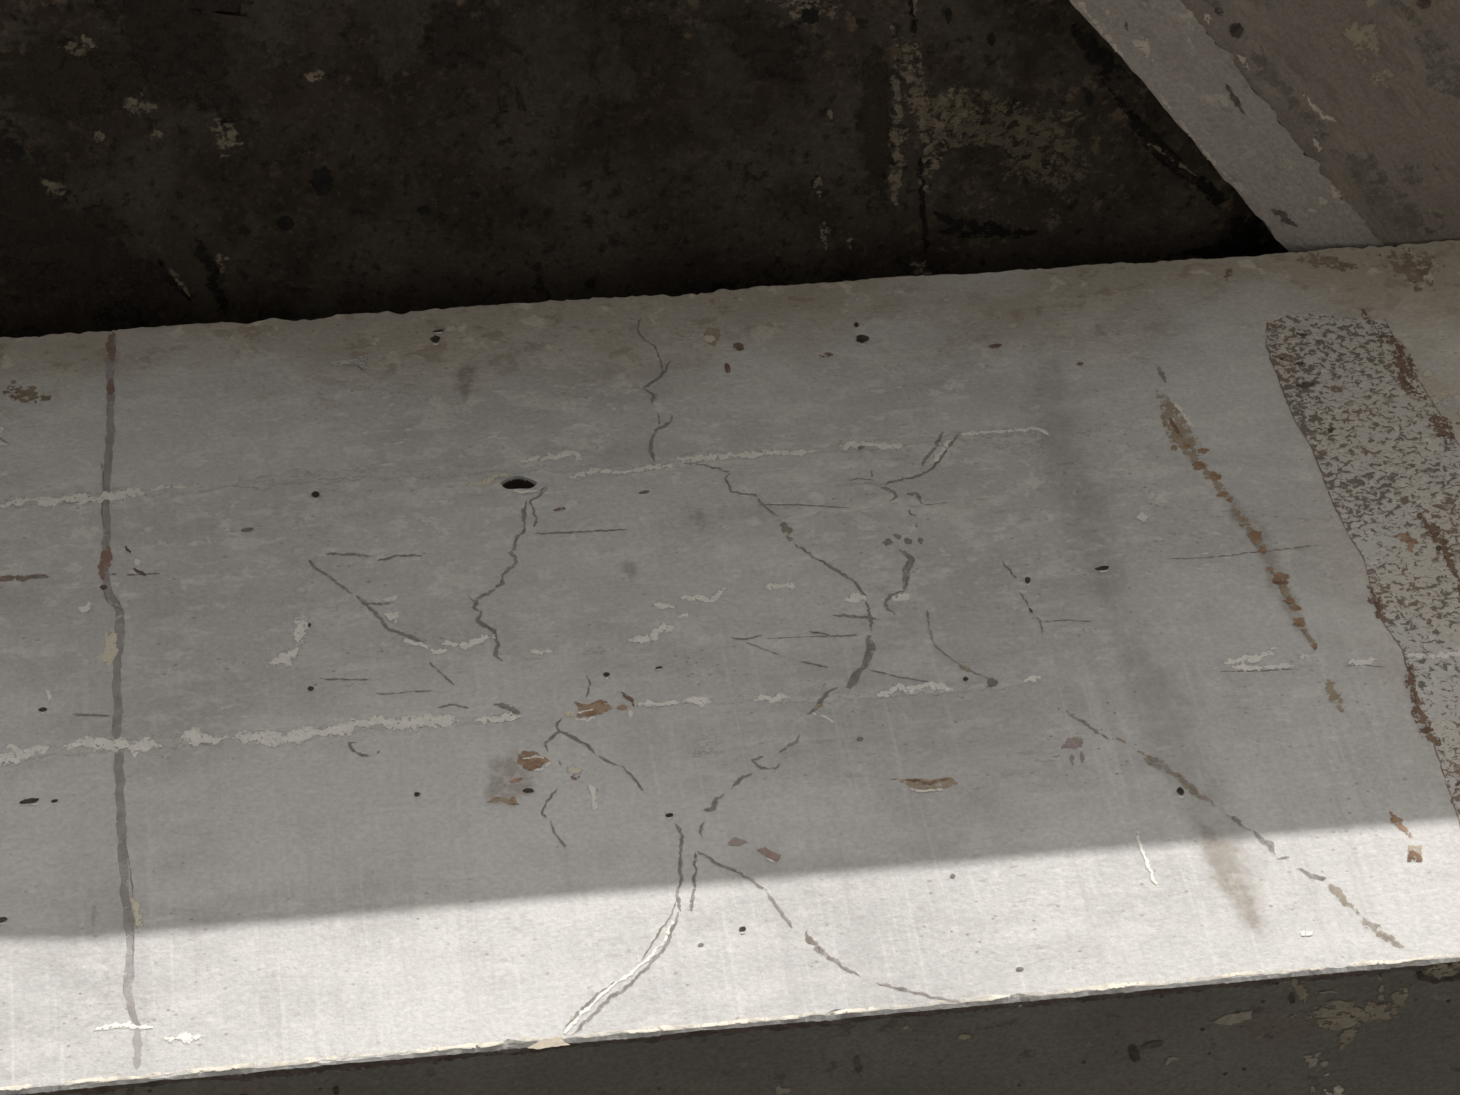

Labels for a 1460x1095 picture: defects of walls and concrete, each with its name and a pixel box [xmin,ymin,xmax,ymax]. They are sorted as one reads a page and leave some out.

rust [1361,309,1454,448]
crack [637,318,980,723]
rust [1157,373,1317,650]
rust [1389,508,1460,603]
crack [98,333,160,1095]
spalling [489,751,599,810]
crack [541,677,643,847]
spalling [564,692,634,722]
crack [528,747,962,1049]
crack [1078,719,1403,948]
rust [1389,811,1423,862]
rust [1404,666,1460,786]